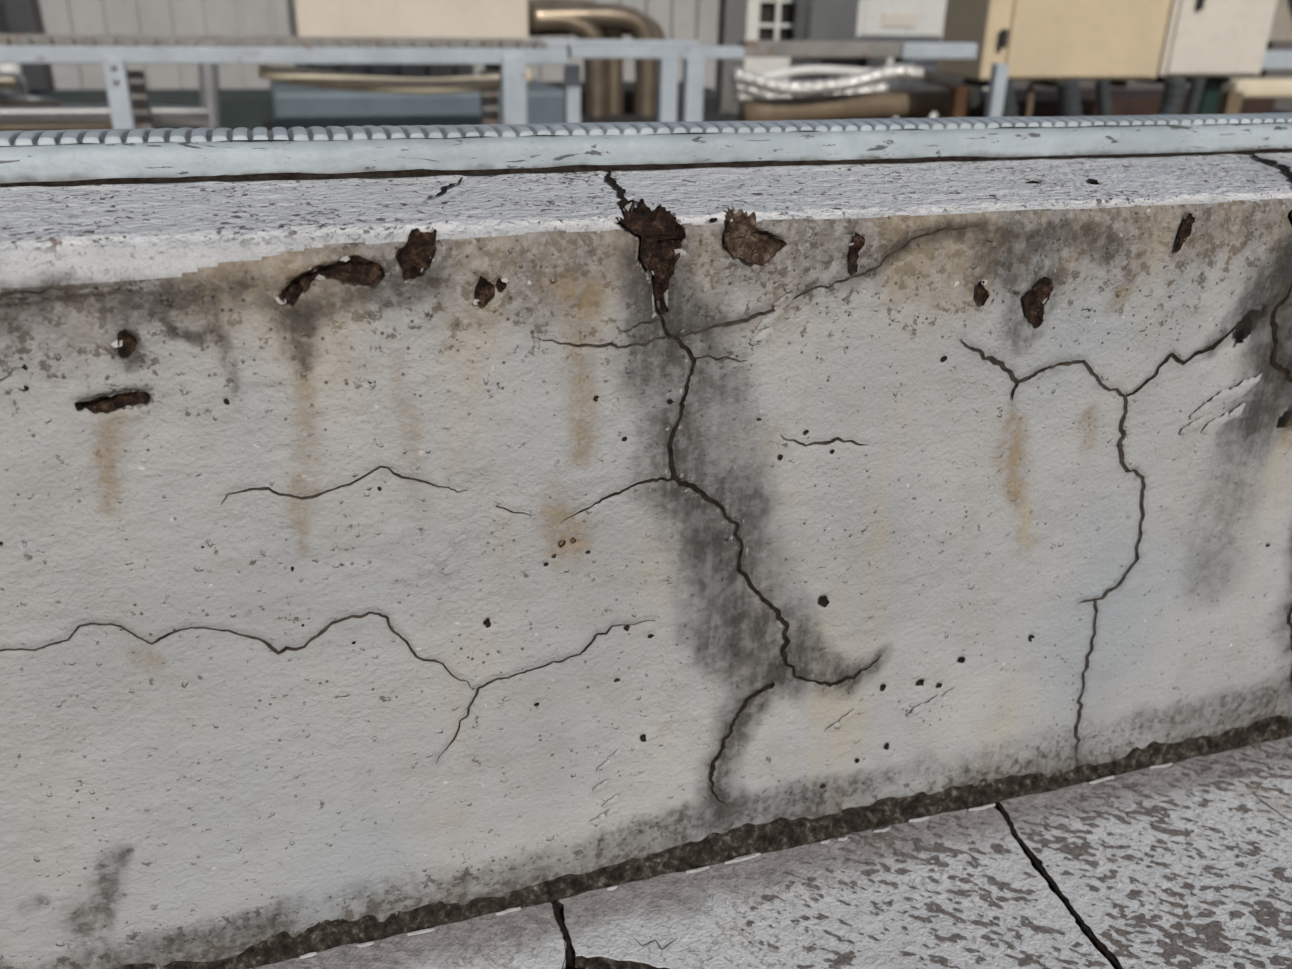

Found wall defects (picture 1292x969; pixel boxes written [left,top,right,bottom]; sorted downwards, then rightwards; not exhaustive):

crack [604,170,651,215]
spalling [610,198,686,313]
spalling [724,204,787,264]
crack [1248,153,1292,180]
damp [1241,251,1292,436]
crack [221,466,468,504]
crack [496,225,979,807]
damp [628,239,878,824]
crack [960,278,1292,765]
crack [0,611,655,764]
crack [550,900,573,959]
crack [996,802,1123,969]